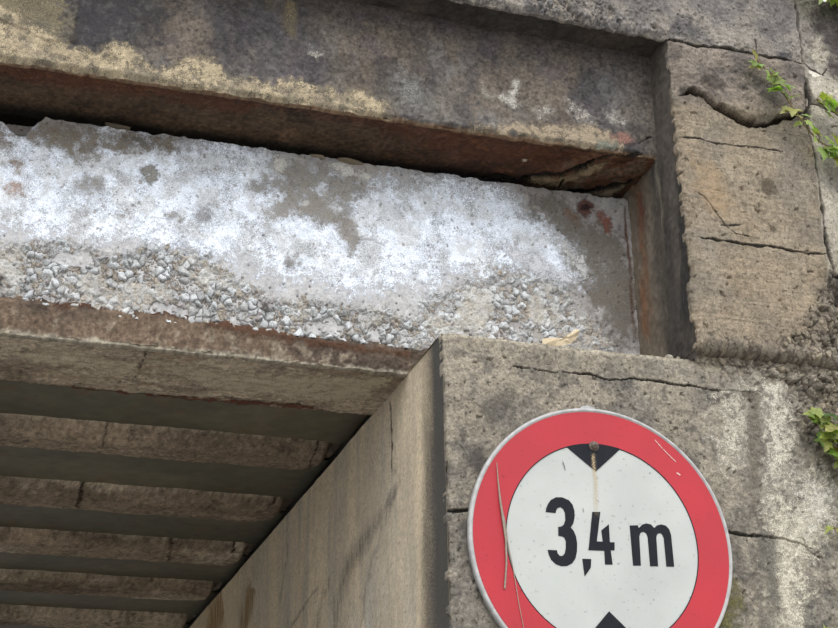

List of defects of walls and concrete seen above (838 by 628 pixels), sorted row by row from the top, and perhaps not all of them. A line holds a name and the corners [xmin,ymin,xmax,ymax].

damp [70,0,181,54]
crack [666,39,785,61]
corrosion [0,65,254,113]
damp [363,56,428,113]
damp [481,80,519,109]
crack [679,67,825,152]
crack [482,137,652,194]
damp [0,122,639,352]
corrosion [566,199,613,233]
corrosion [207,319,411,357]
crack [513,366,717,392]